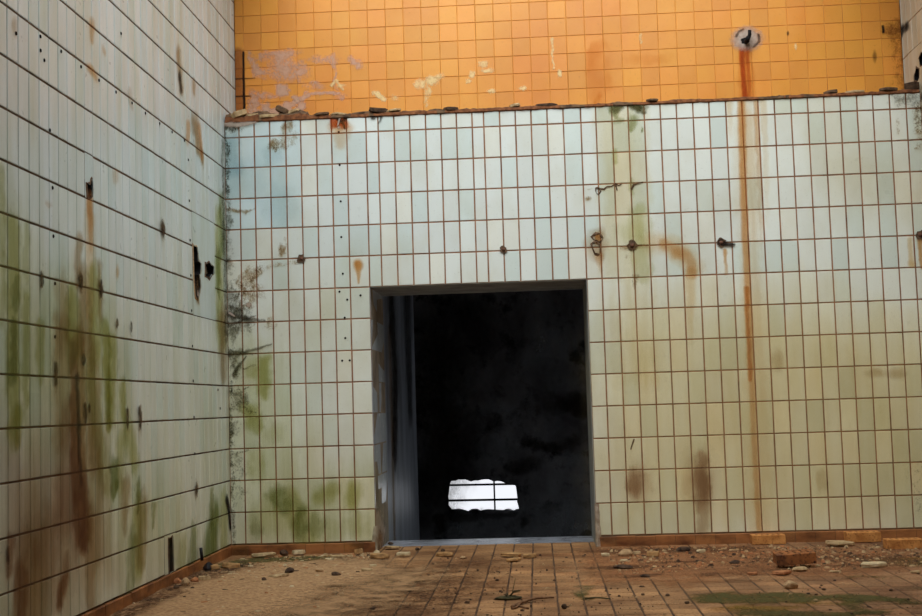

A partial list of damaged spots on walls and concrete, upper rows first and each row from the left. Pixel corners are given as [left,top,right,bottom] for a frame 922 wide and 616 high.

flaking render [733,27,760,49]
spalling [225,49,922,123]
corrosion [740,47,749,97]
spalling [192,243,214,301]
water stain [221,127,272,495]